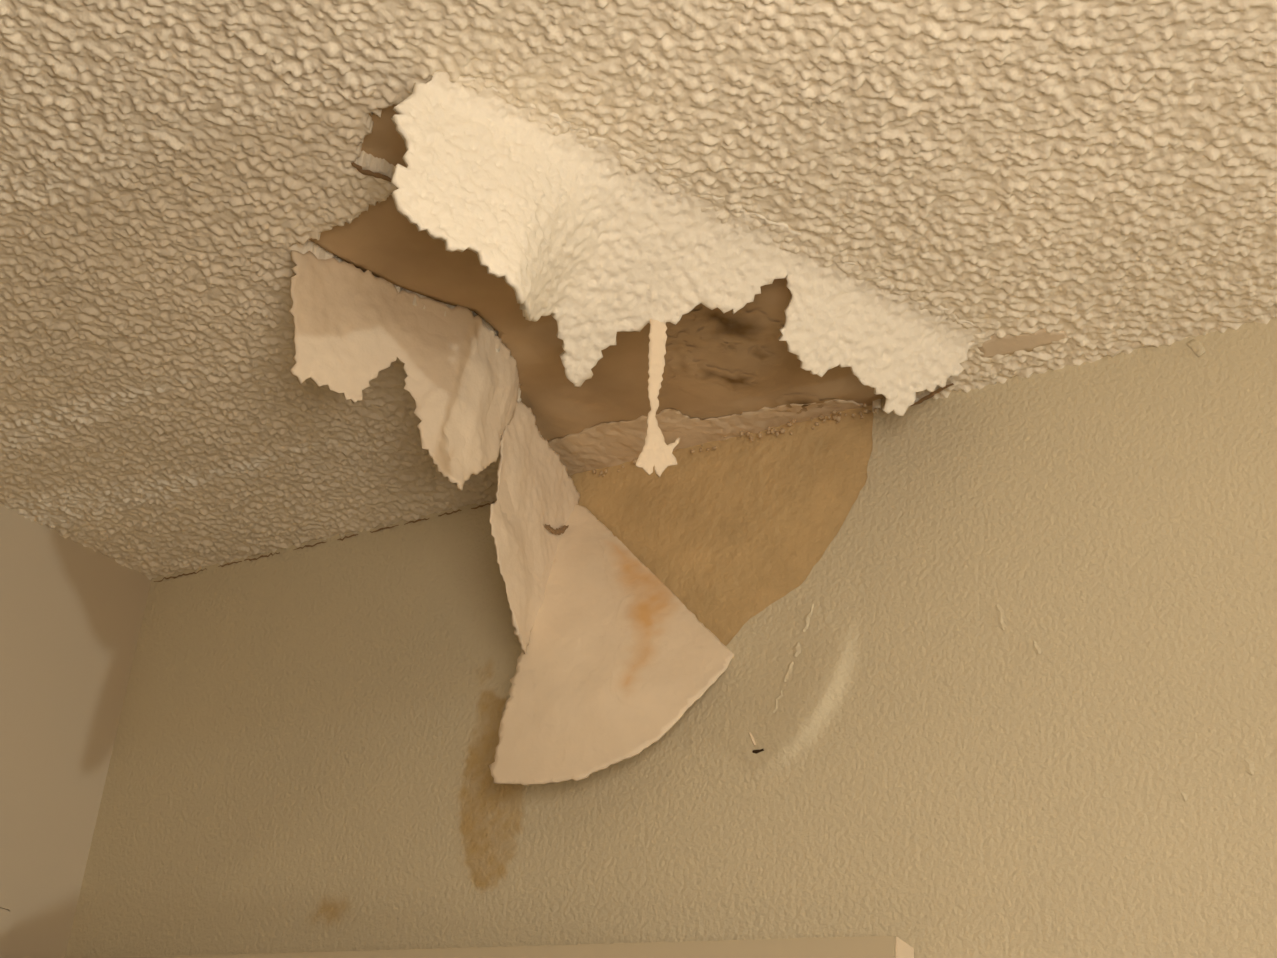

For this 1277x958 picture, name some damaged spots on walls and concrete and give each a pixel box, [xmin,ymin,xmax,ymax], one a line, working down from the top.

water stain [454,653,528,896]
peeling [289,71,1071,786]